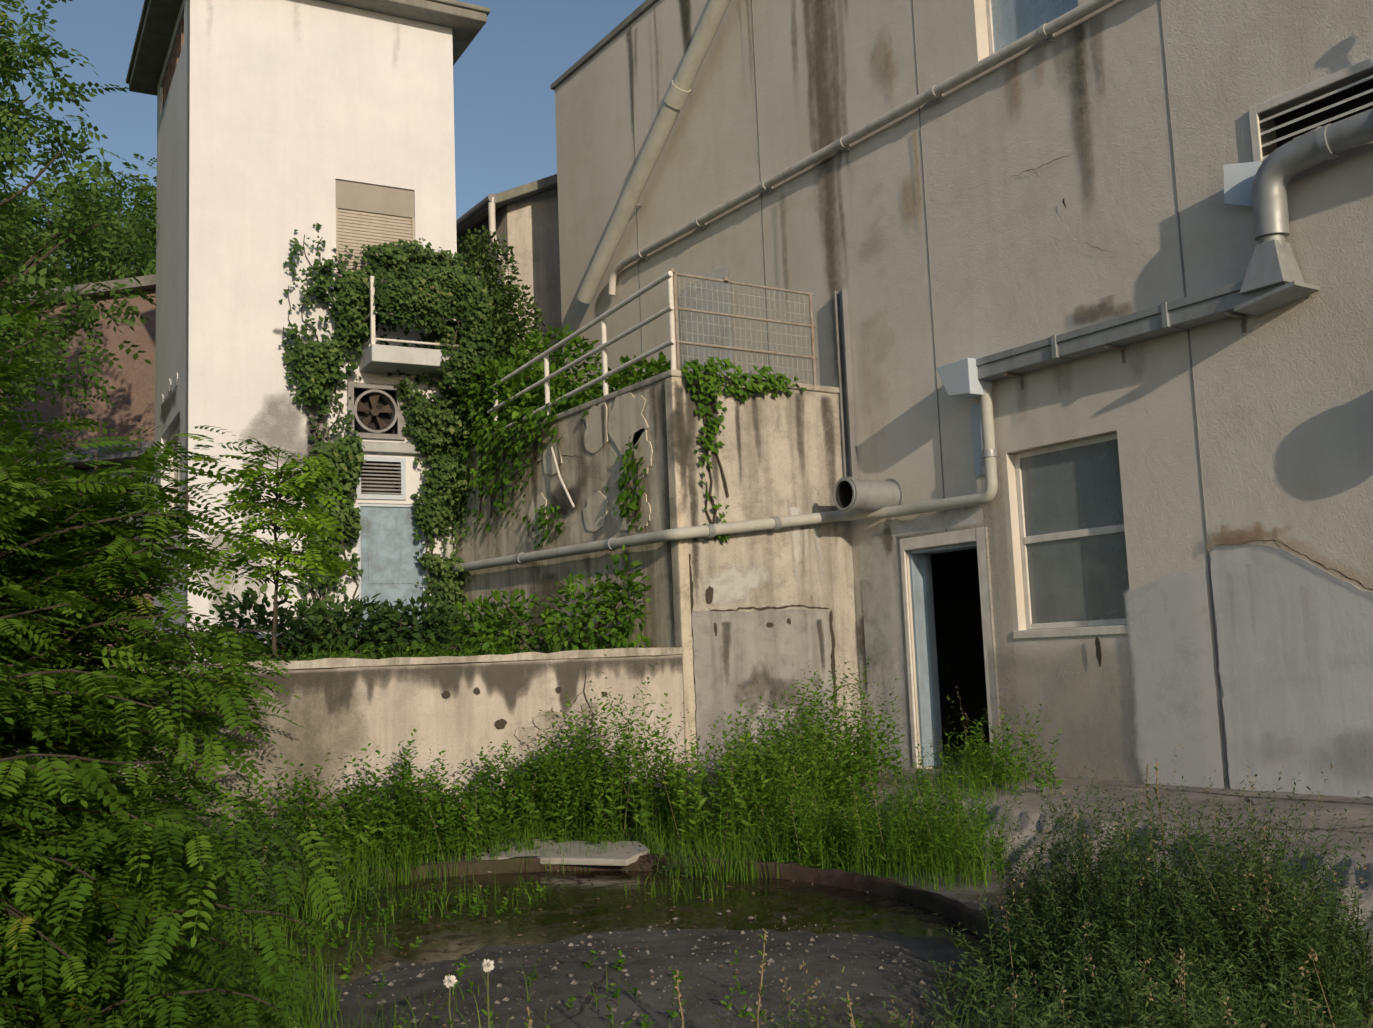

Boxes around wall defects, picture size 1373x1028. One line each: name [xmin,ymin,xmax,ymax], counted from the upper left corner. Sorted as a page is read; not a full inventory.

water stain [805,0,843,264]
water stain [1074,296,1130,322]
peeling [543,440,562,475]
peeling [583,392,653,532]
peeling [528,493,548,538]
water stain [817,620,825,663]
water stain [130,657,683,839]